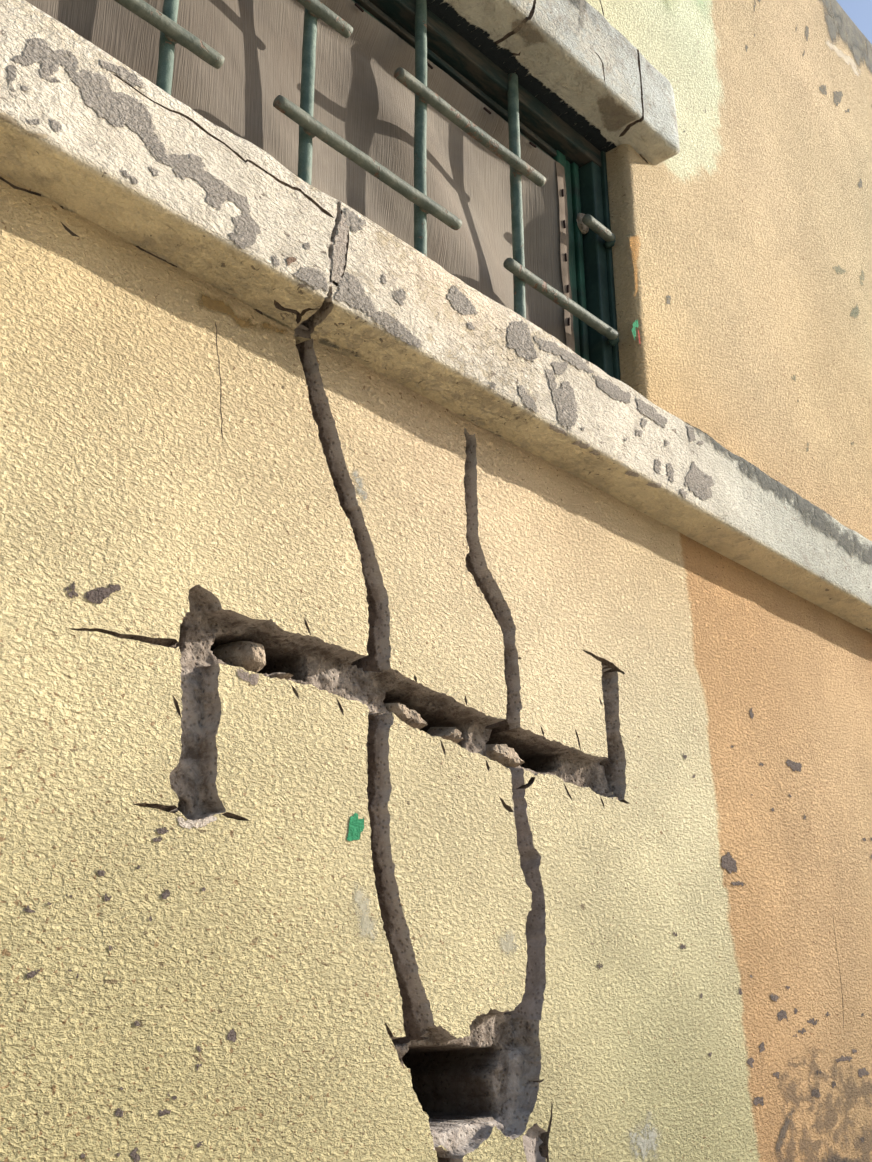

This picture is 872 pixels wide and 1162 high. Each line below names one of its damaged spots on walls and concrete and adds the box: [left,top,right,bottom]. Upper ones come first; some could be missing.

crack [0,177,79,237]
peeling [7,38,261,249]
crack [494,0,536,56]
crack [619,49,648,163]
peeling [819,84,850,113]
crack [111,73,391,672]
crack [464,427,522,735]
crack [366,712,434,1045]
crack [499,767,547,1021]
spalling [384,1009,546,1162]
crack [539,1103,553,1162]
leakage [776,1110,794,1162]